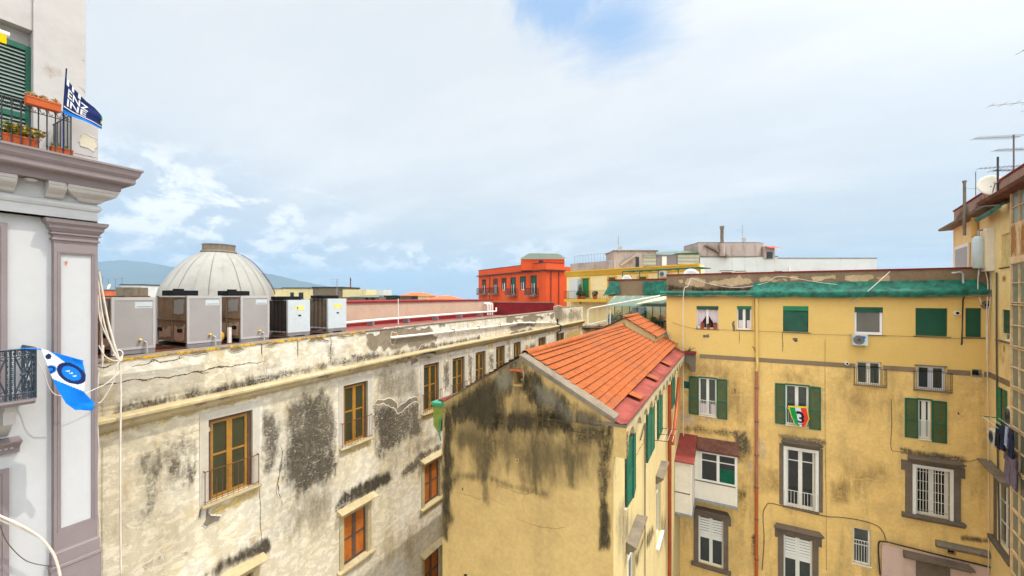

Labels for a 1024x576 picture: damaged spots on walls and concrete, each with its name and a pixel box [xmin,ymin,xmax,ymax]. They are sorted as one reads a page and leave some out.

peeling [678,274,891,288]
crack [98,344,266,385]
peeling [373,396,419,414]
damp [141,441,193,481]
mould [263,392,337,499]
damp [323,344,628,548]
damp [681,416,763,458]
damp [215,539,271,574]